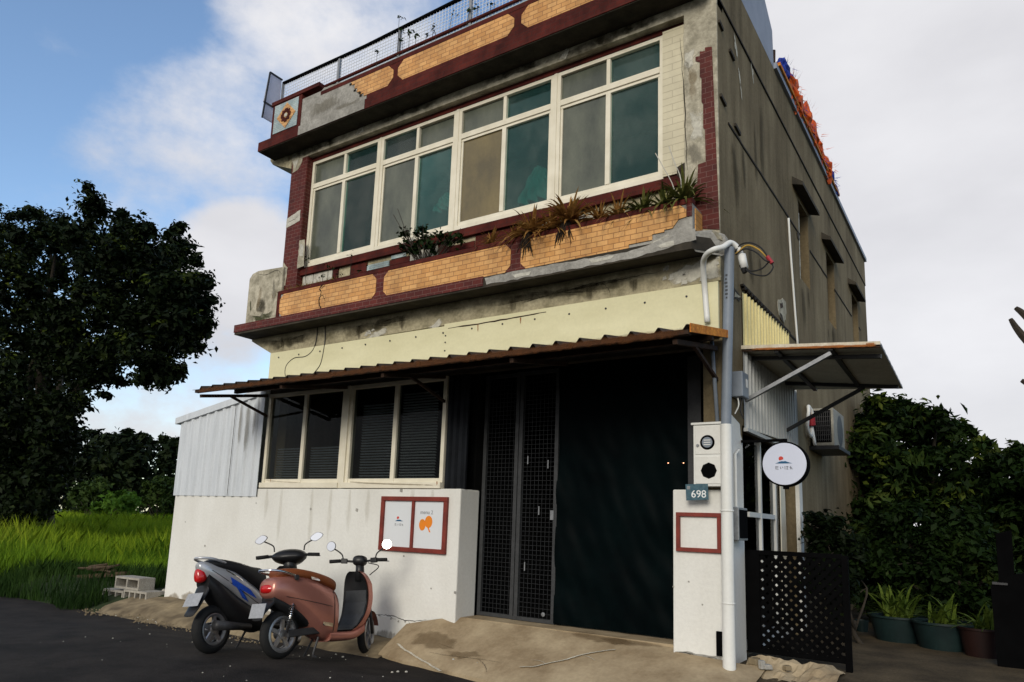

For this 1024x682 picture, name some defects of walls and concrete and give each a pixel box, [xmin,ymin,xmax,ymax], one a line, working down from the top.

peeling [300,81,364,125]
peeling [677,32,705,197]
spalling [485,220,728,285]